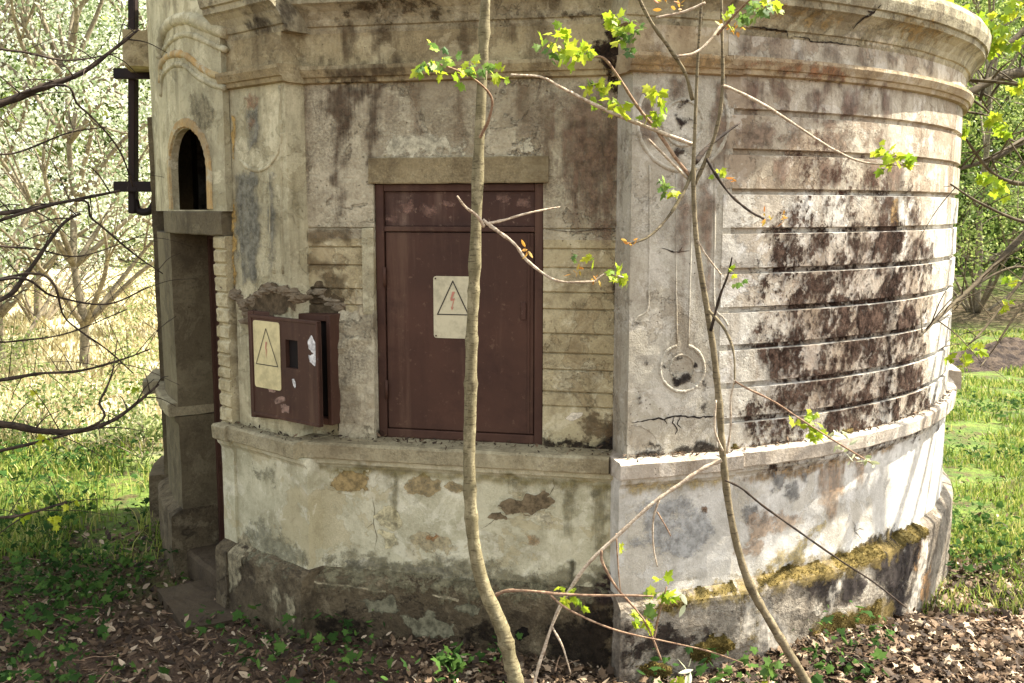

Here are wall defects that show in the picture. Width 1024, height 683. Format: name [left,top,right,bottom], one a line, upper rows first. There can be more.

crack [750,5,881,46]
damp [325,0,442,164]
damp [235,172,275,282]
damp [711,84,946,448]
flaking render [247,282,296,316]
flaking render [309,281,346,313]
crack [633,415,726,434]
peeling [329,469,369,494]
peeling [404,473,463,497]
flaking render [487,489,556,520]
damp [803,525,930,625]
damp [742,599,796,654]